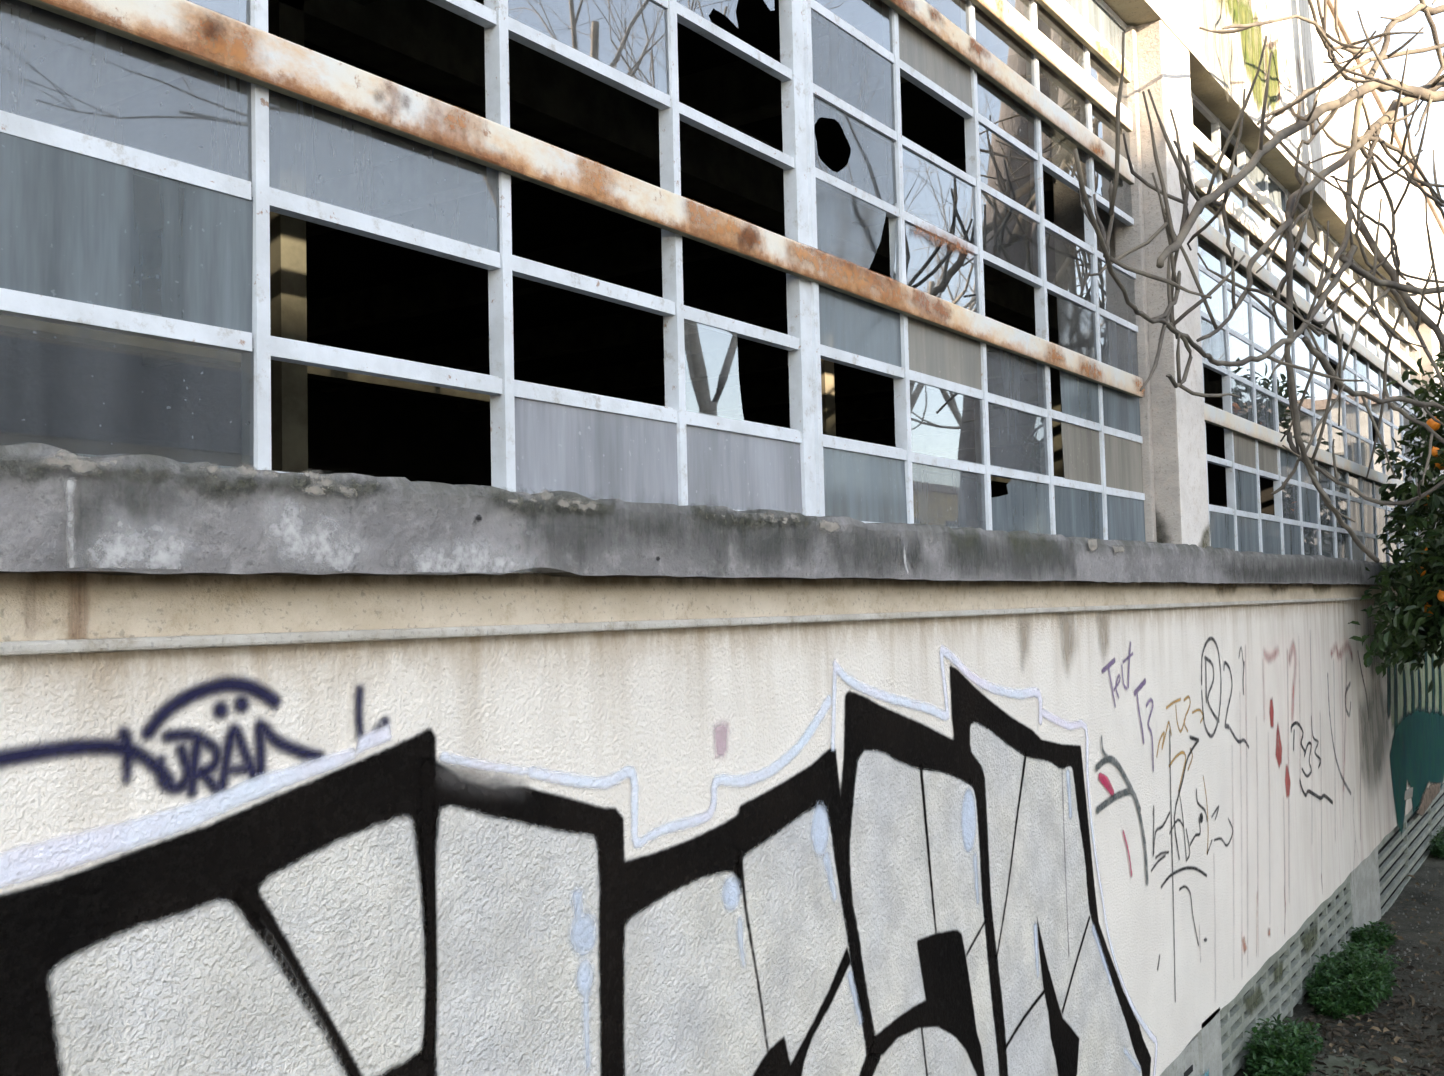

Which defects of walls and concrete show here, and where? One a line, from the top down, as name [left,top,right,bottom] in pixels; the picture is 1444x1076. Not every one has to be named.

corrosion [181,18,253,67]
corrosion [970,38,984,57]
corrosion [1095,40,1129,77]
leakage [1193,0,1241,109]
corrosion [435,107,509,166]
corrosion [580,160,607,195]
corrosion [687,199,761,251]
corrosion [916,227,971,252]
corrosion [788,243,951,319]